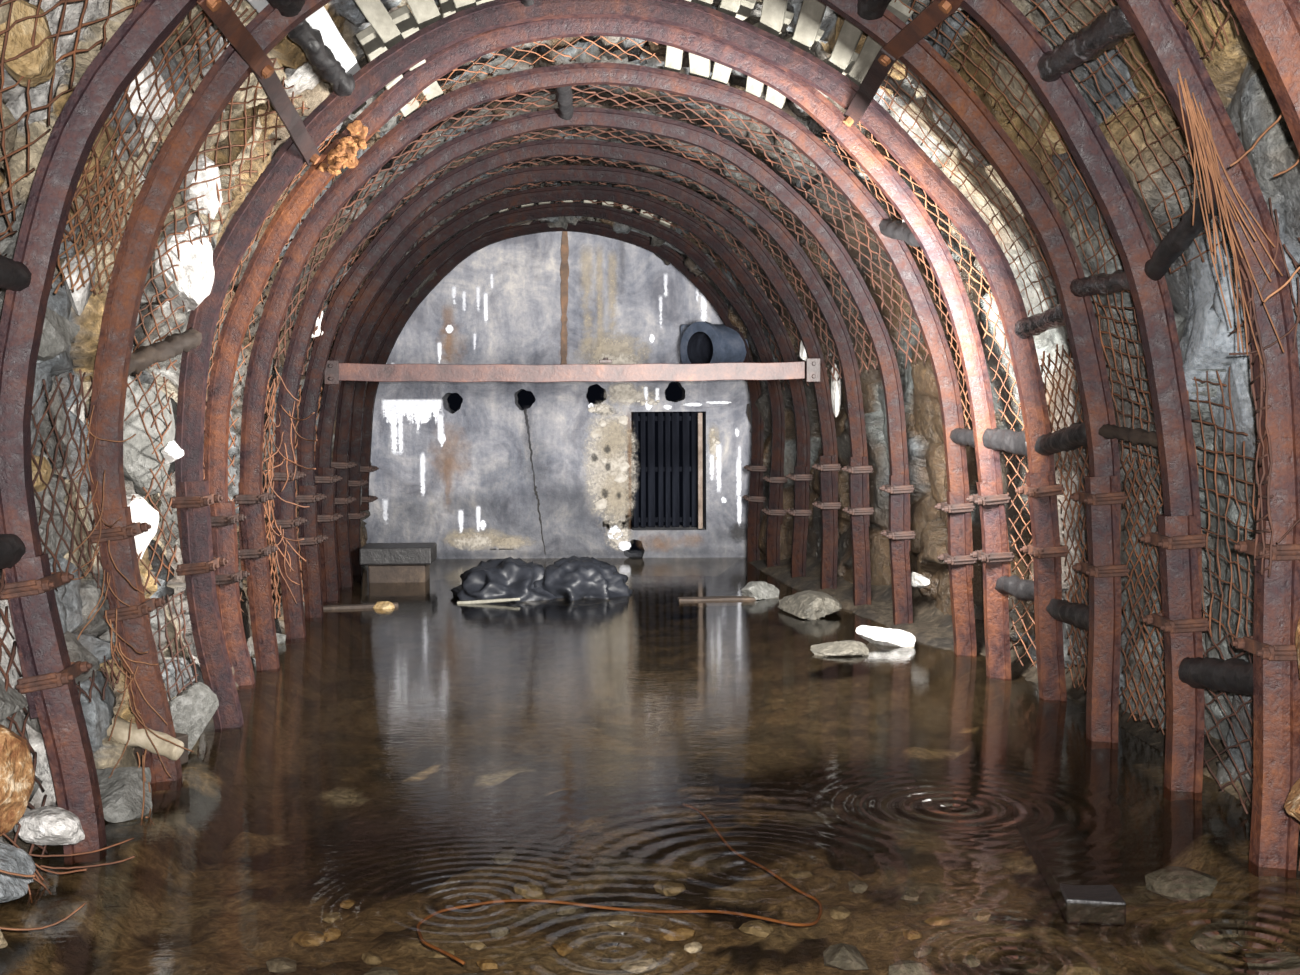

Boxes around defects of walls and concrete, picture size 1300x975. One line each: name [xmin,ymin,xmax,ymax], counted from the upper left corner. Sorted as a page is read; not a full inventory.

efflorescence [382,399,446,453]
spalling [586,384,660,551]